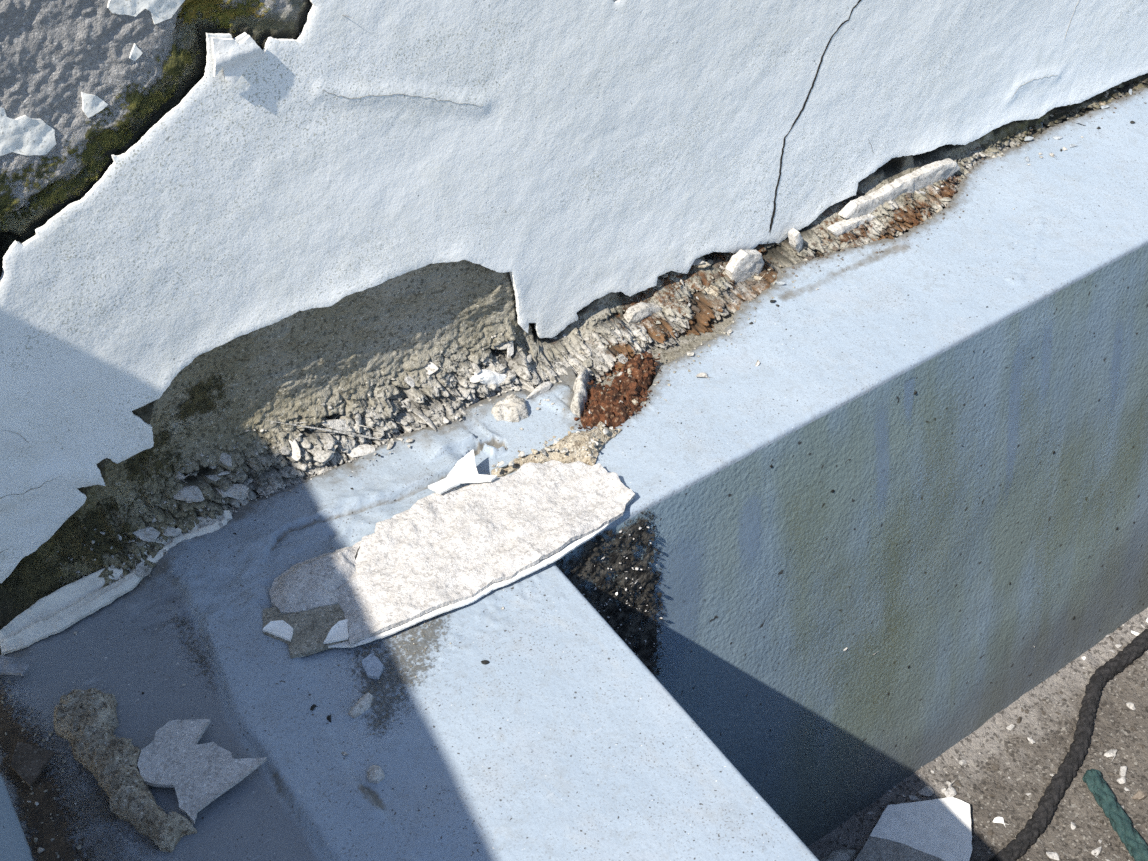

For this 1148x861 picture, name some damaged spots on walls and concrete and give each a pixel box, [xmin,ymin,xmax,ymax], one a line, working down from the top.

spalling [0,0,313,278]
crack [766,0,862,245]
spalling [0,110,1069,656]
corrosion [574,347,662,431]